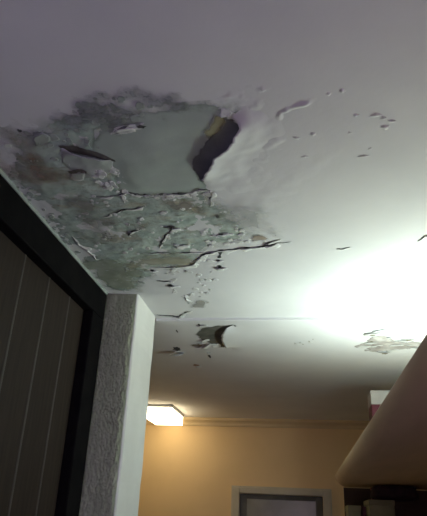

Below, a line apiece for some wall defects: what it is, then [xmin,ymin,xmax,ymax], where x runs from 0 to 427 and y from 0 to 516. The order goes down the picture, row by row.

peeling [59,96,285,211]
leakage [12,90,242,290]
crack [99,189,217,218]
crack [146,226,291,283]
peeling [192,324,268,358]
peeling [355,329,421,354]